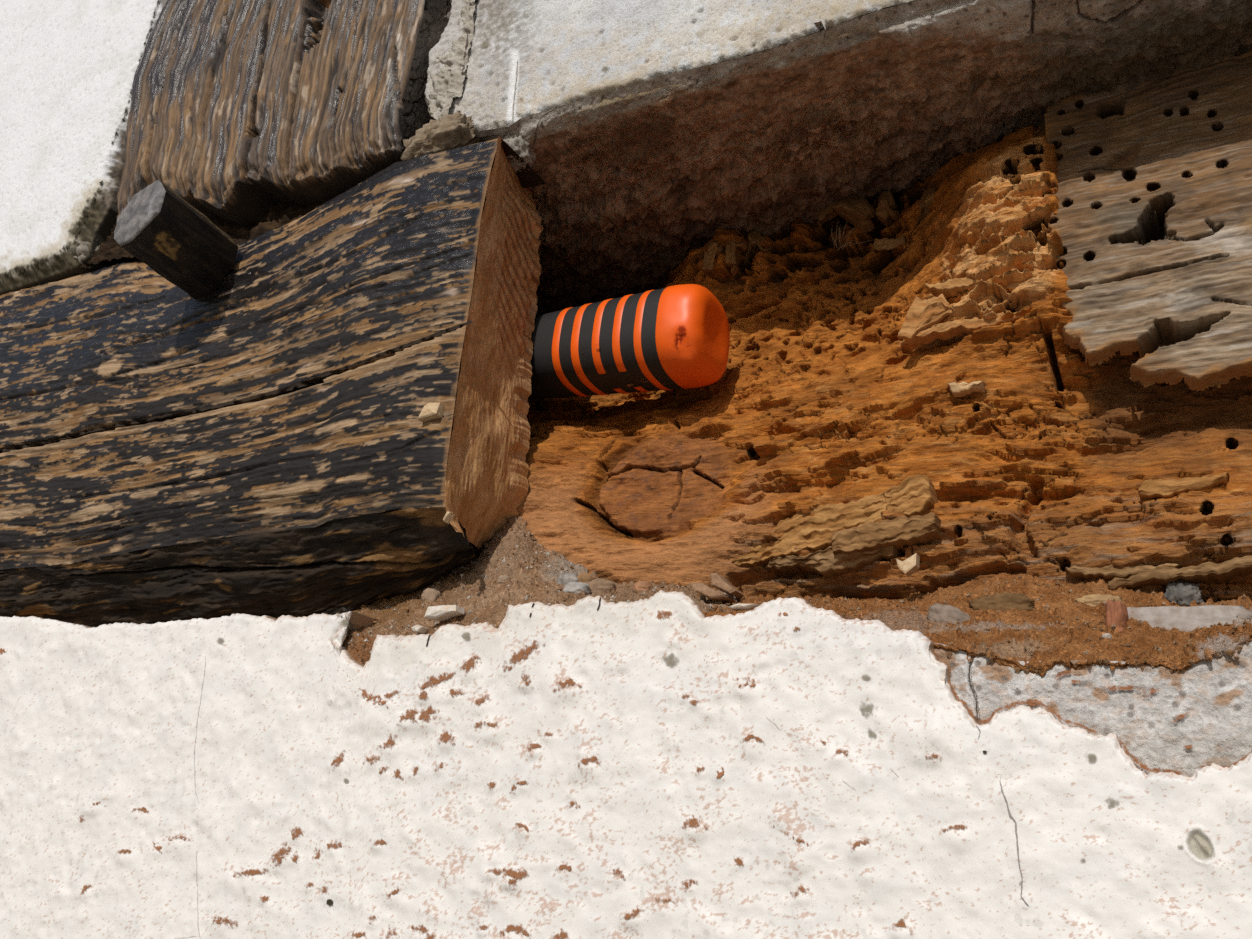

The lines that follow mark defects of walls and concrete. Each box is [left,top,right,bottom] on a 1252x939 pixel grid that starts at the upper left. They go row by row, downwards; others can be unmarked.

crack [1077,0,1144,23]
flaking render [729,603,760,611]
peeling [1164,580,1204,607]
flaking render [411,624,429,634]
spalling [932,641,1252,777]
crack [999,777,1029,906]